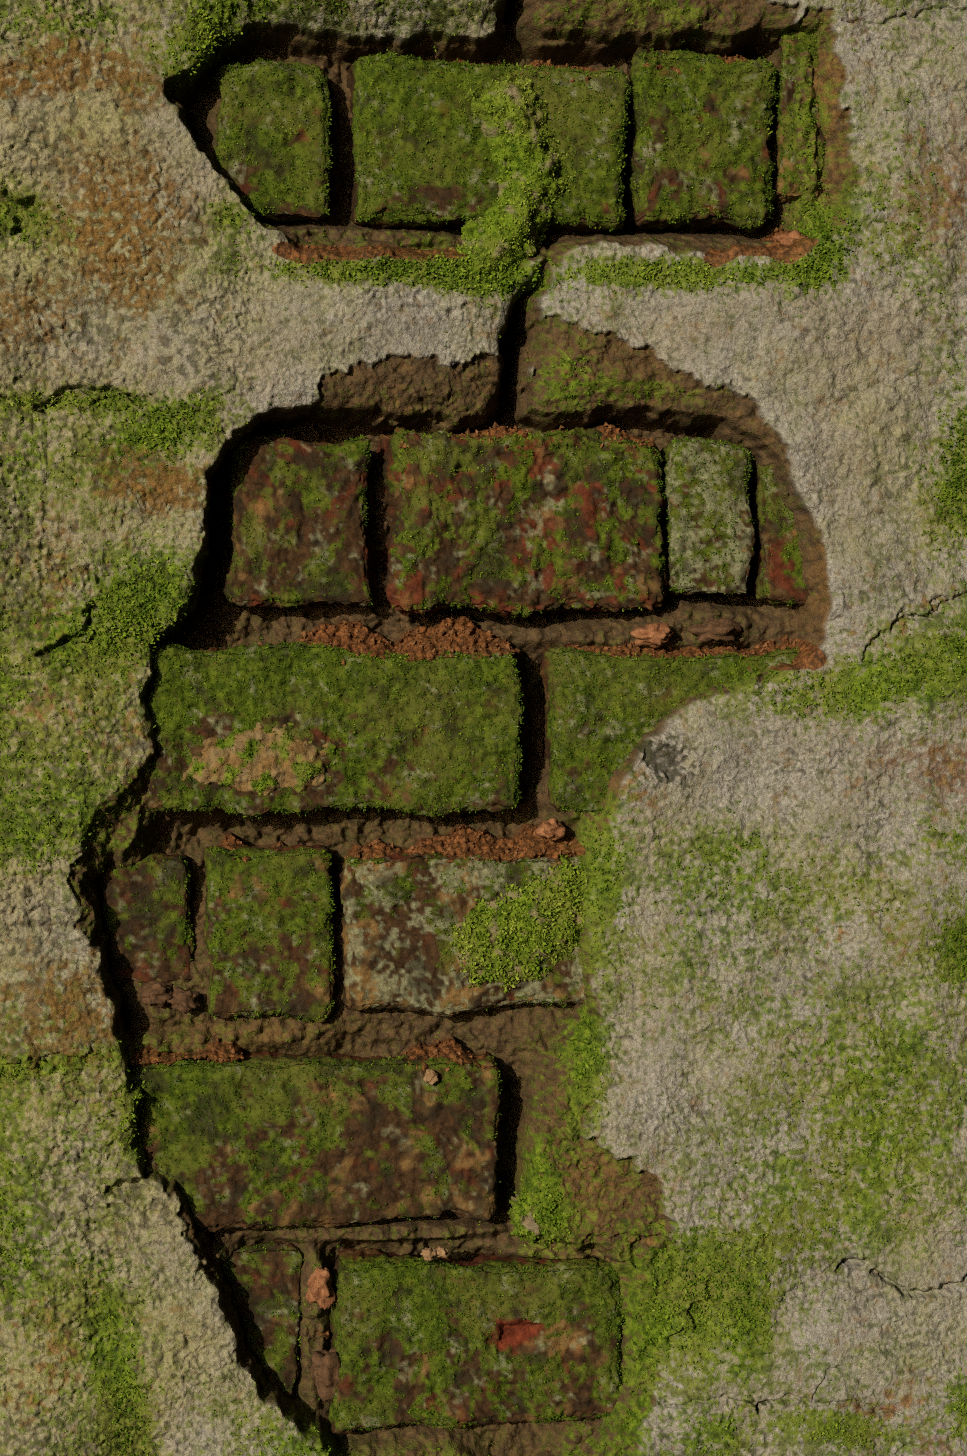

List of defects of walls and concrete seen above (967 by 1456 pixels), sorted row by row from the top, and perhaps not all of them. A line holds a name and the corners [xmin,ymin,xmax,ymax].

spalling [164,0,862,272]
crack [862,593,967,663]
spalling [67,353,500,1456]
spalling [518,315,836,1456]
crack [835,1257,967,1301]
spalling [486,1316,543,1356]
crack [659,1366,902,1417]